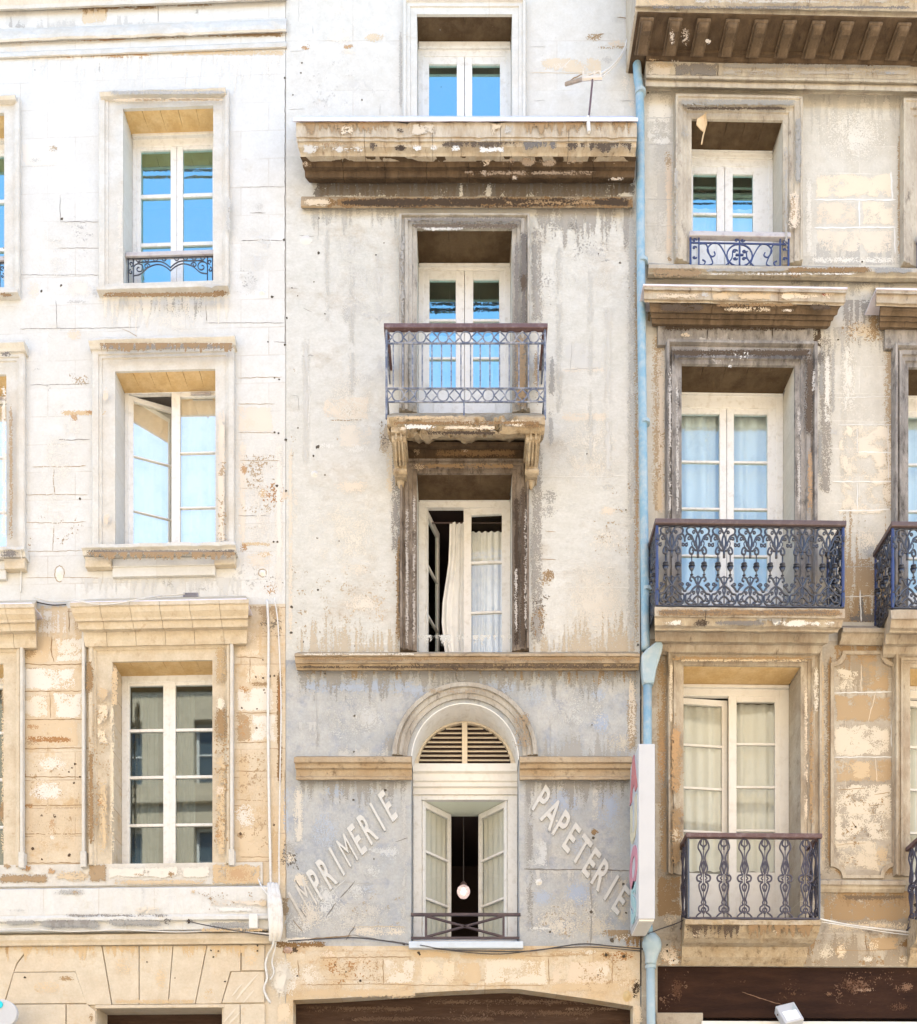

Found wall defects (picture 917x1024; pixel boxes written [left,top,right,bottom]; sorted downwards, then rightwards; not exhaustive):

damp [400,199,627,493]
spalling [242,454,288,513]
damp [298,671,637,754]
spalling [214,713,265,851]
peeling [304,949,627,1022]